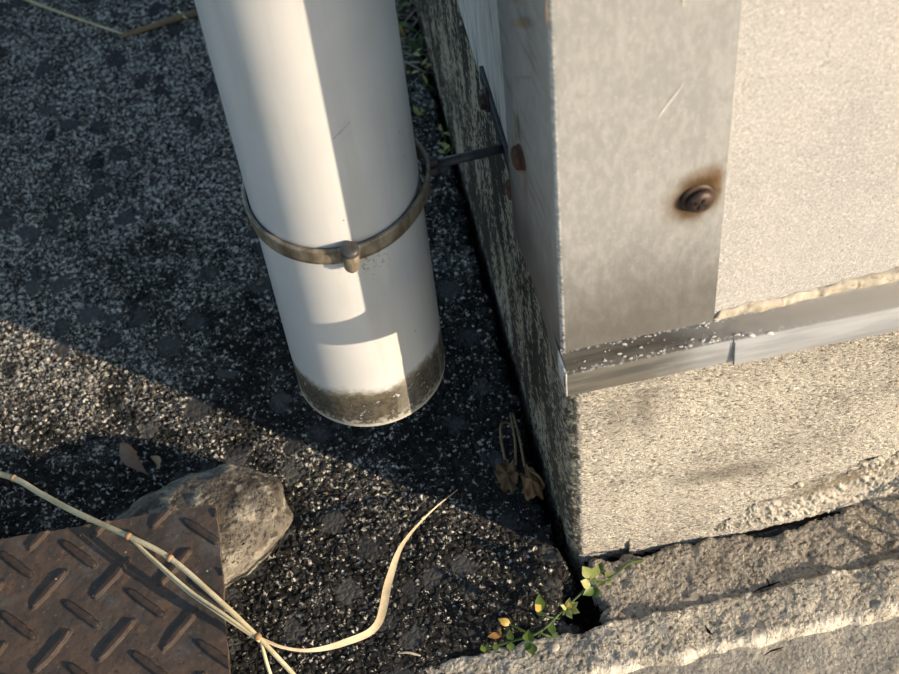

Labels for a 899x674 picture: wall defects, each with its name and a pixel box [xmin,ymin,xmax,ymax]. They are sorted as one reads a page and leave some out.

corrosion [676,173,720,215]
spalling [714,452,899,532]
crack [729,511,841,538]